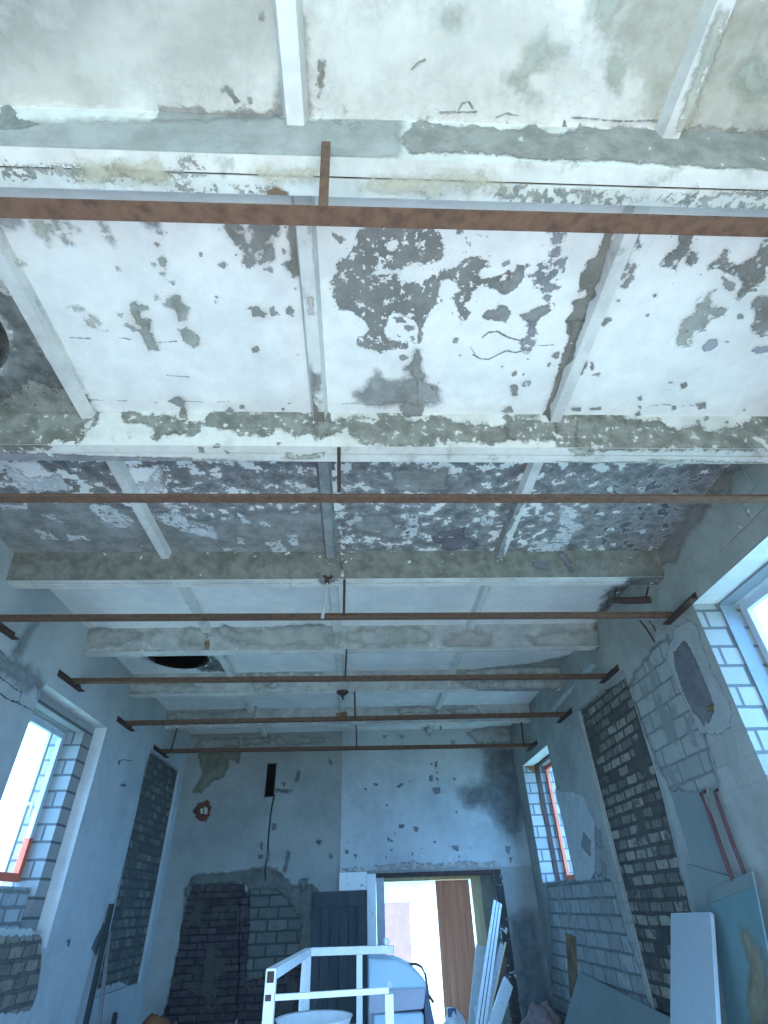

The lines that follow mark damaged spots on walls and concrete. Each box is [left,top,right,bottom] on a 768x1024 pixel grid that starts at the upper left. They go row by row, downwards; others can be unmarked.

peeling [118,230,200,351]
crack [473,331,547,360]
peeling [0,466,69,511]
peeling [89,503,135,528]
peeling [137,468,271,552]
peeling [264,534,300,552]
peeling [394,513,420,541]
peeling [527,505,584,552]
damp [193,736,325,793]
damp [463,726,522,835]
flaking render [547,620,733,1024]
flaking render [164,883,302,1024]